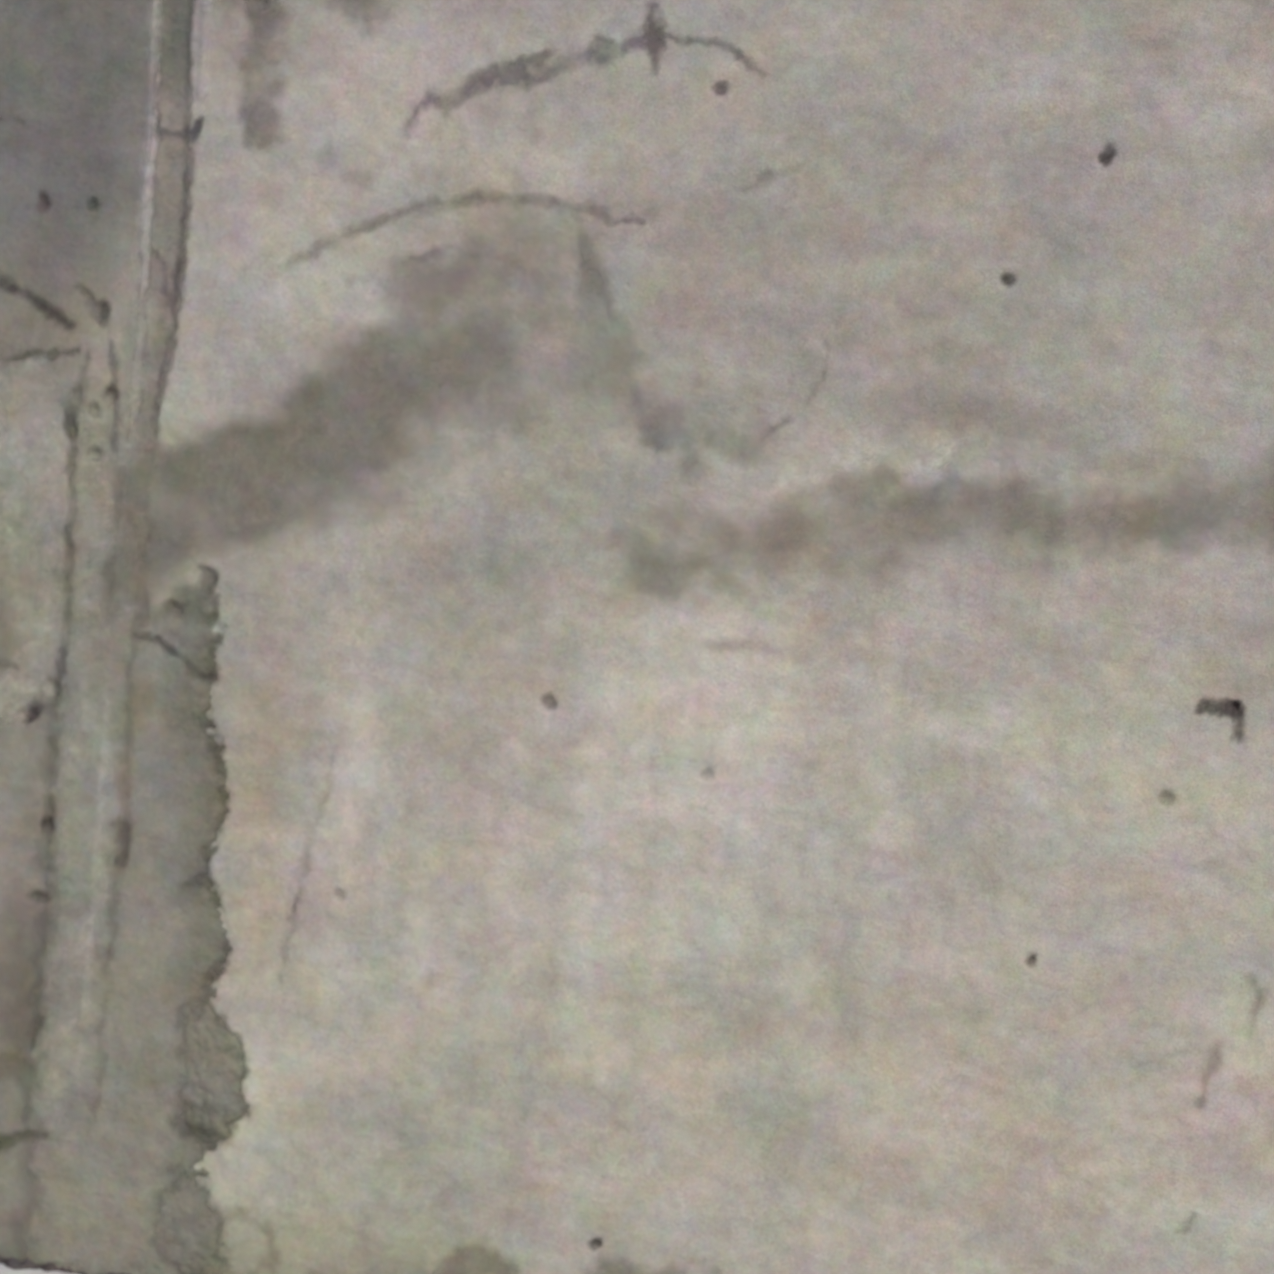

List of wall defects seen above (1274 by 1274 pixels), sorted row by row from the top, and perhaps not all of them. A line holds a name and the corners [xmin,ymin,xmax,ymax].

crack [583,4,751,66]
leakage [240,0,283,145]
crack [415,51,556,113]
crack [454,192,559,204]
leakage [113,326,512,586]
leakage [851,467,1274,553]
leakage [441,1247,517,1274]